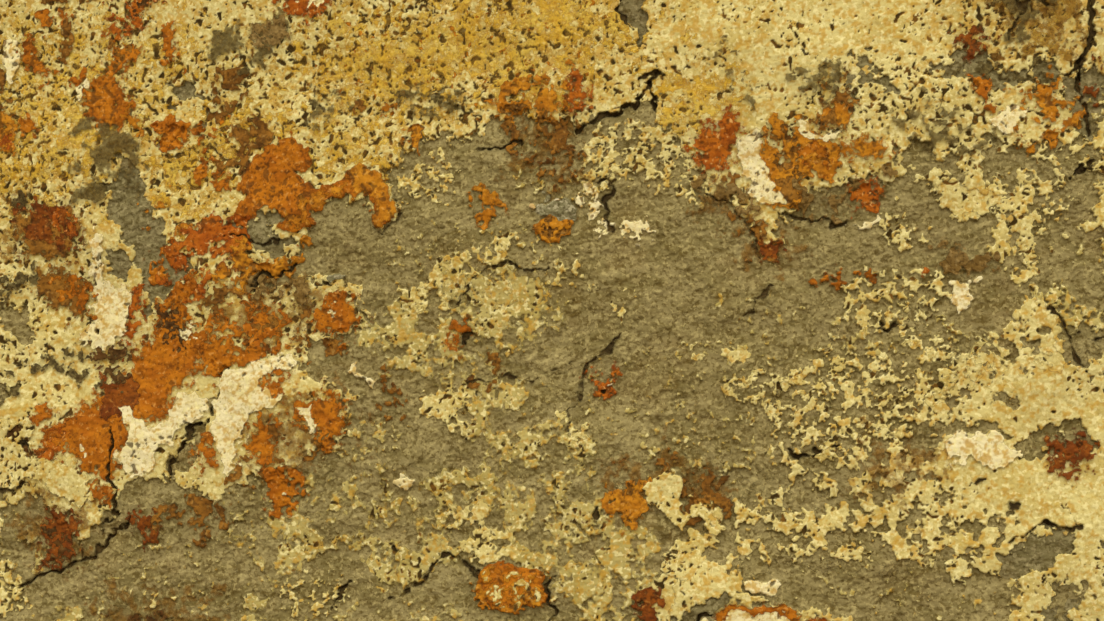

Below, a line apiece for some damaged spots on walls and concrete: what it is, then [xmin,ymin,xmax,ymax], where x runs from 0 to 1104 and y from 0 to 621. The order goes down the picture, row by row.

spalling [79,152,198,351]
corrosion [0,0,408,575]
corrosion [474,51,601,201]
crack [575,69,665,134]
corrosion [682,69,900,281]
spalling [980,61,1104,372]
crack [10,430,131,588]
peeling [113,352,300,478]
corrosion [600,436,738,536]
spalling [681,496,1076,621]
peeling [899,418,1100,470]
corrosion [1044,416,1100,481]